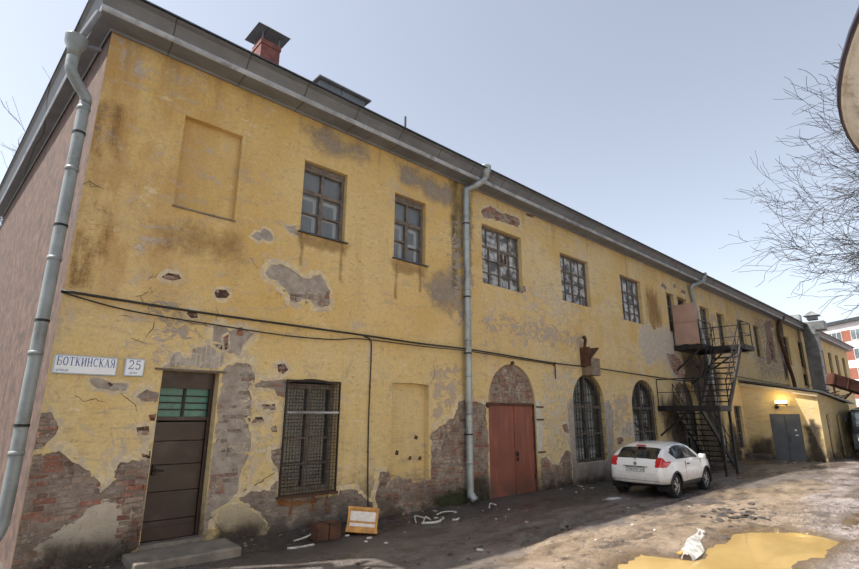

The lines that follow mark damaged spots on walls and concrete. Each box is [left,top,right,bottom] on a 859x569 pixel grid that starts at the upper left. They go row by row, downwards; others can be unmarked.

peeling [248,226,274,244]
spalling [260,258,334,312]
damp [401,166,459,287]
spalling [12,375,159,569]
spalling [144,269,490,539]
spalling [539,367,577,490]
damp [805,420,825,462]